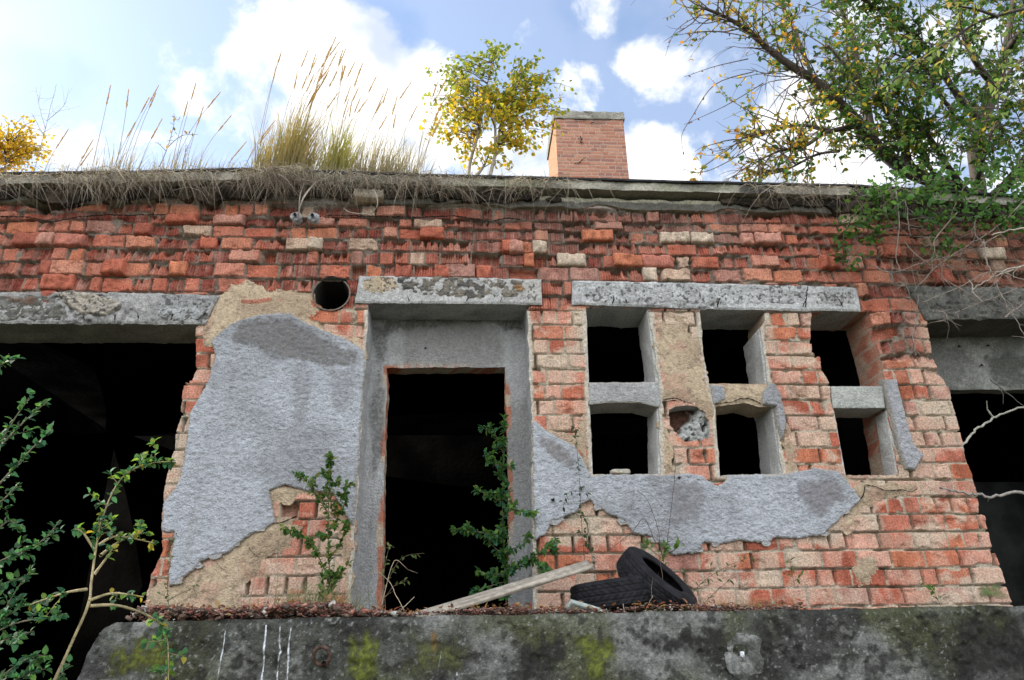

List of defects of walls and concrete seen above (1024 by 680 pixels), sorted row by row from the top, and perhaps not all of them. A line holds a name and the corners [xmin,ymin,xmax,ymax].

spalling [11,232,86,248]
spalling [168,261,189,277]
spalling [133,213,247,249]
spalling [307,217,335,252]
spalling [930,269,955,286]
spalling [977,247,1007,260]
flaking render [363,227,924,556]
flaking render [147,280,369,608]
flaking render [850,555,878,587]
water stain [652,629,723,654]